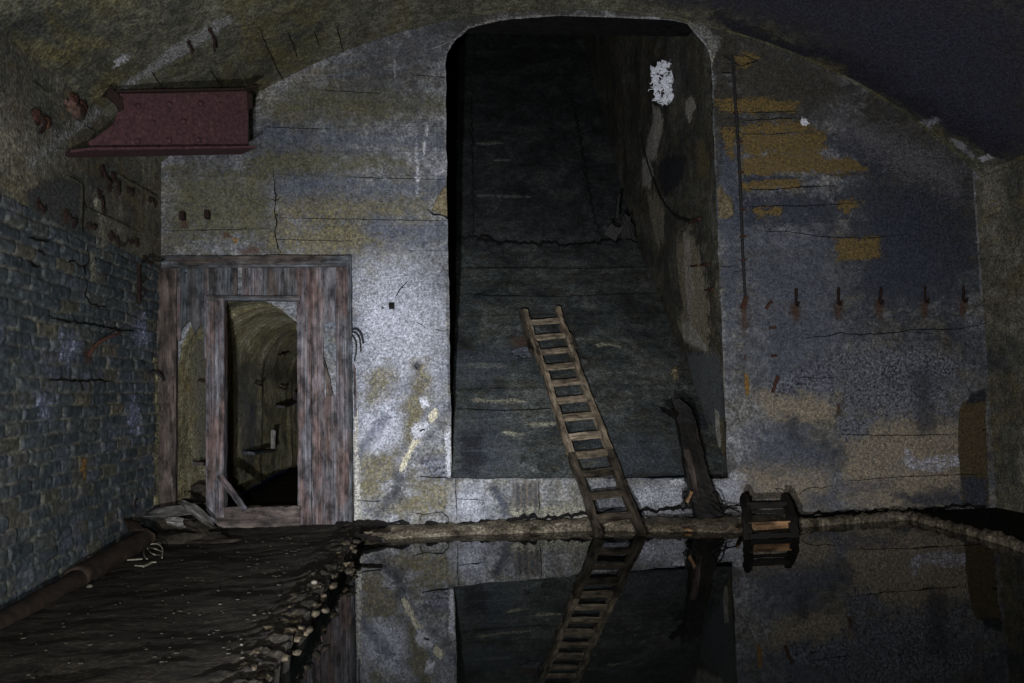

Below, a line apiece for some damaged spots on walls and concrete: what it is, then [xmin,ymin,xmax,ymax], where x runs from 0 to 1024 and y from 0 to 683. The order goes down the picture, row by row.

crack [177,97,639,269]
peeling [714,94,871,220]
peeling [833,234,884,266]
crack [801,323,985,339]